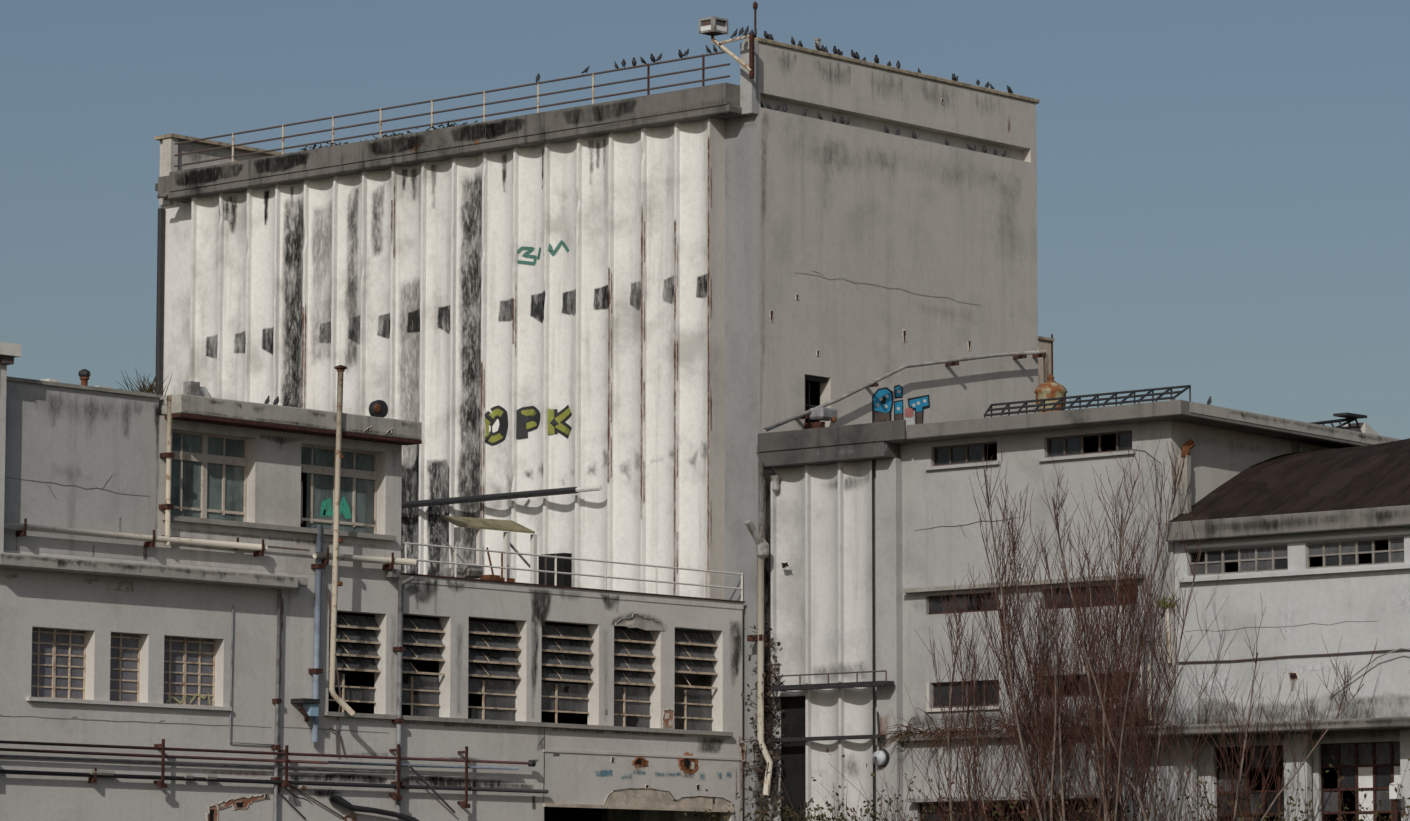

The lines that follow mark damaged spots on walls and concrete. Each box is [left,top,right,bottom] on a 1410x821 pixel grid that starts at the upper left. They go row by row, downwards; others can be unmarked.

damp [453,119,523,140]
damp [176,154,304,185]
damp [236,187,304,408]
damp [347,191,381,357]
damp [531,290,545,323]
damp [562,289,576,315]
damp [594,285,610,310]
crack [794,270,978,305]
damp [378,314,390,339]
damp [401,177,482,600]
crack [5,474,145,500]
peeling [603,752,732,809]